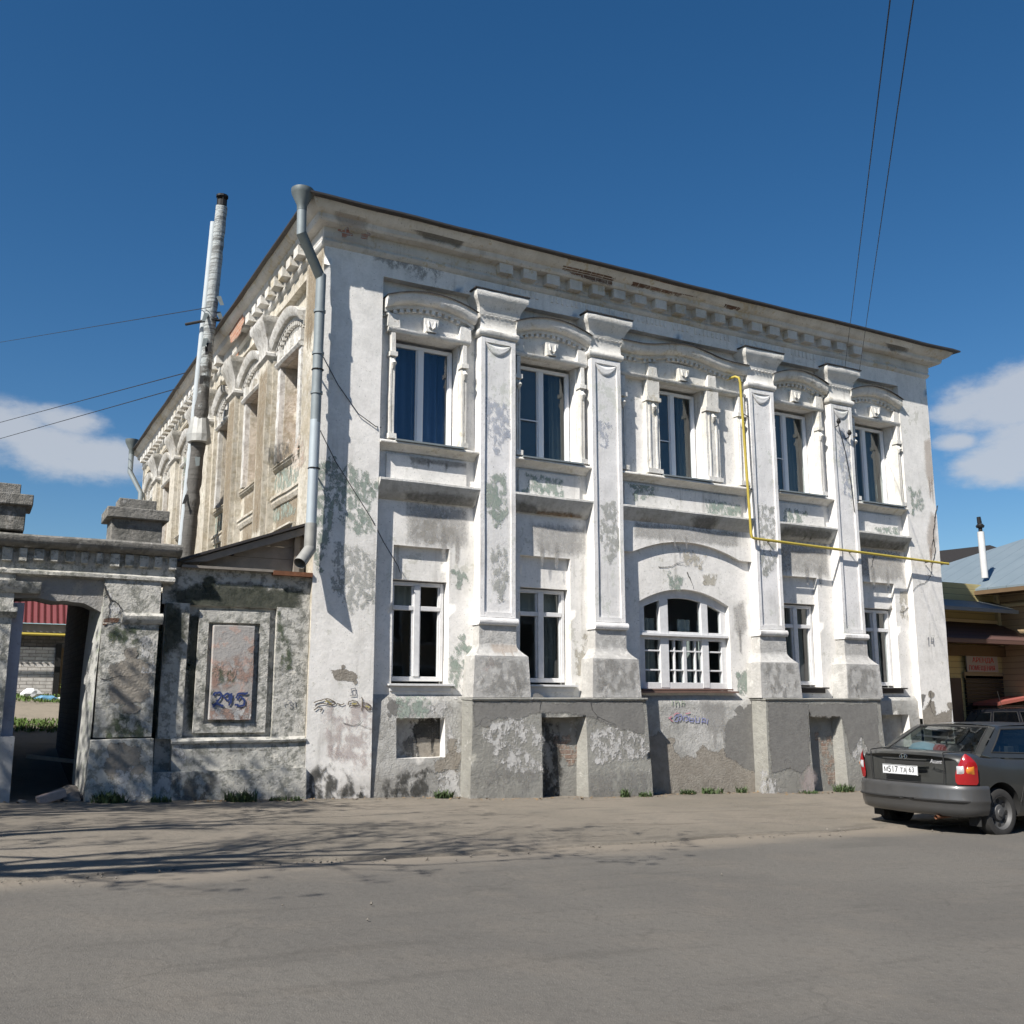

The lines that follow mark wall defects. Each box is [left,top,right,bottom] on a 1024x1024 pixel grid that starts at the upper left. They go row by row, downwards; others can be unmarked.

flaking render [229,314,244,356]
peeling [480,718,577,773]
flaking render [590,670,779,794]